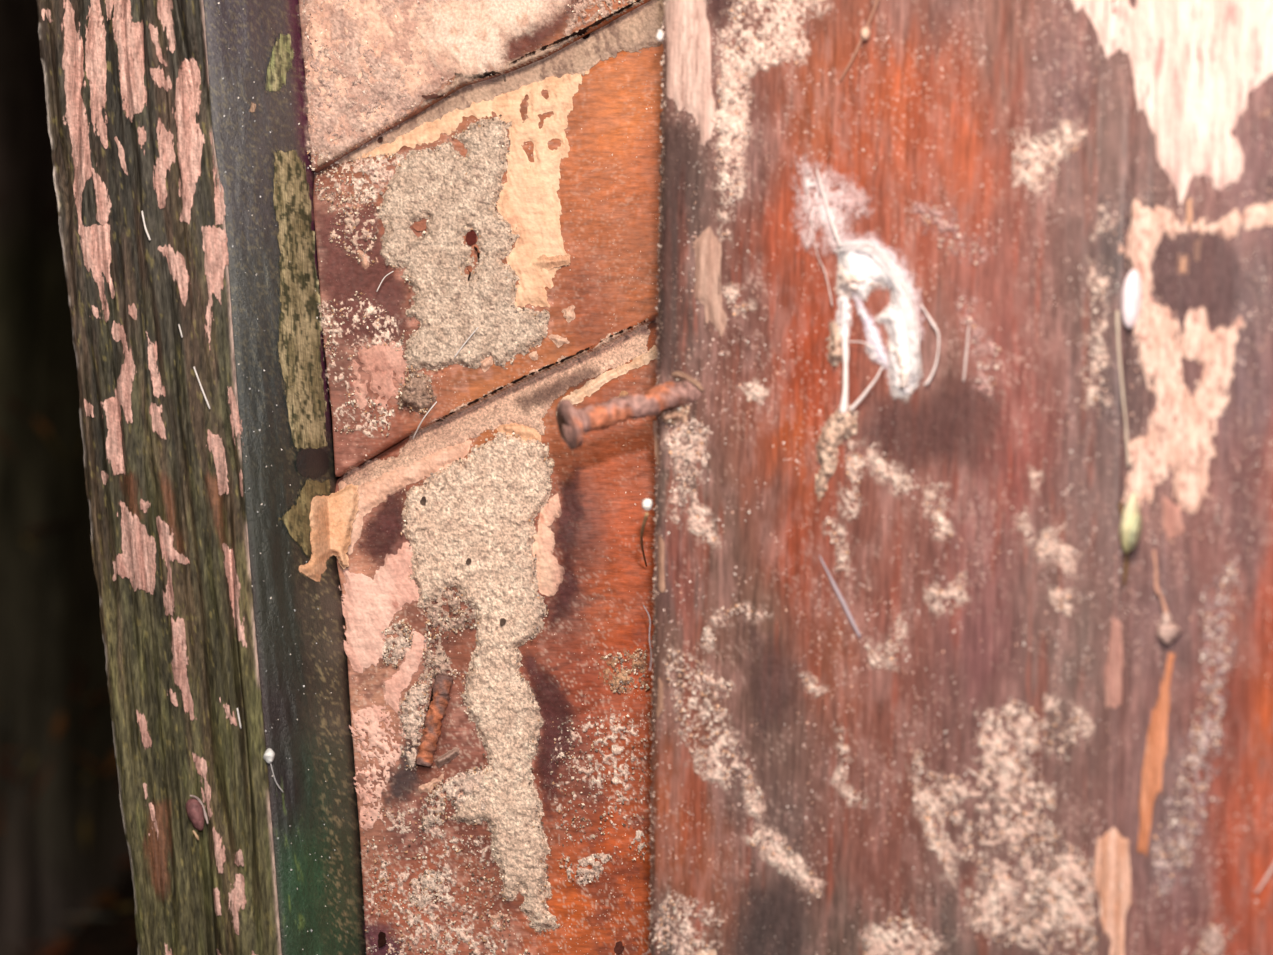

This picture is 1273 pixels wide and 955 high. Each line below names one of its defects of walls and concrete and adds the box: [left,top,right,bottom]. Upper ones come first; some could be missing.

peeling [41,0,229,485]
peeling [273,149,328,449]
peeling [353,70,590,322]
peeling [1072,0,1273,541]
peeling [112,499,197,721]
peeling [206,387,243,497]
peeling [222,543,247,648]
peeling [279,439,472,673]
peeling [532,493,565,597]
peeling [136,709,152,749]
peeling [349,630,429,830]
peeling [192,752,246,935]